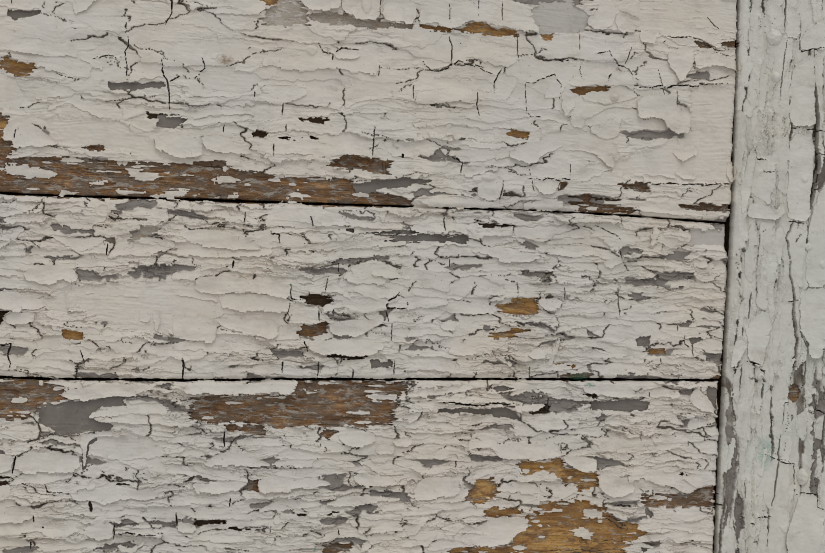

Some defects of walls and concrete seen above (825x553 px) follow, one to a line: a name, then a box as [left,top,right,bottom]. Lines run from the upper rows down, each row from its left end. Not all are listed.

peeling [0,3,77,77]
crack [161,60,205,110]
crack [427,40,501,87]
peeling [214,0,762,134]
crack [40,166,129,175]
crack [628,180,720,188]
crack [791,112,818,202]
peeling [0,61,725,553]
crack [0,343,12,370]
crack [439,400,507,408]
crack [539,504,631,553]